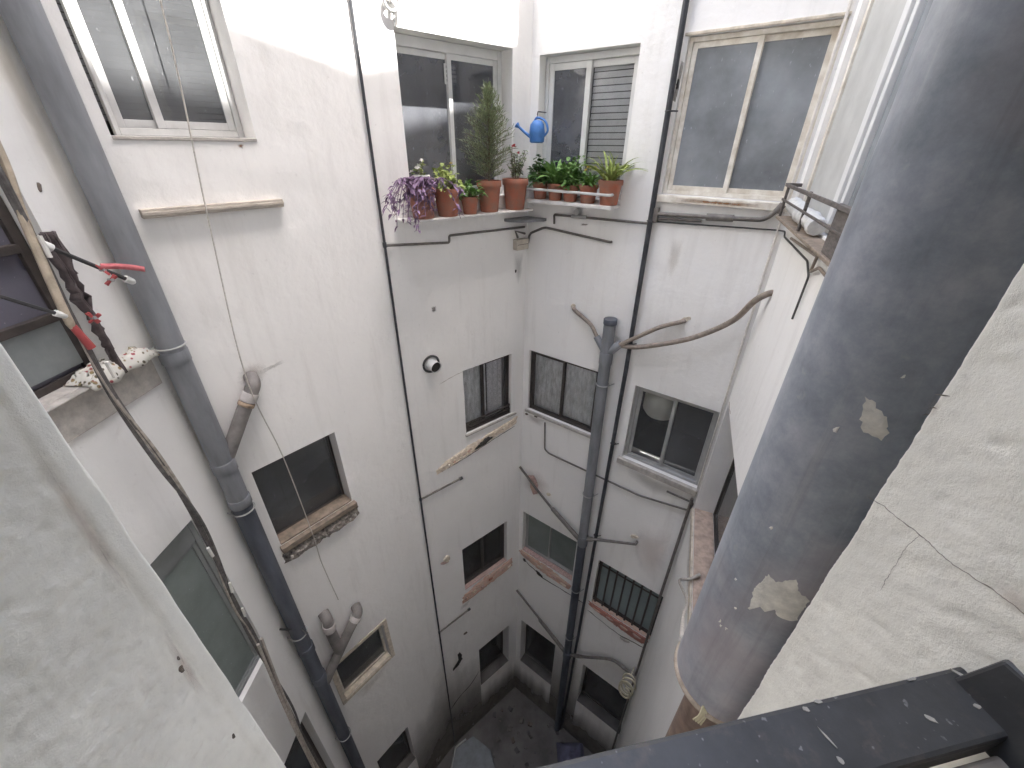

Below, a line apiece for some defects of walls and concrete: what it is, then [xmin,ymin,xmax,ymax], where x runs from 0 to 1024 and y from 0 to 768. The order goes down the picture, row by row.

crack [867,496,1024,614]